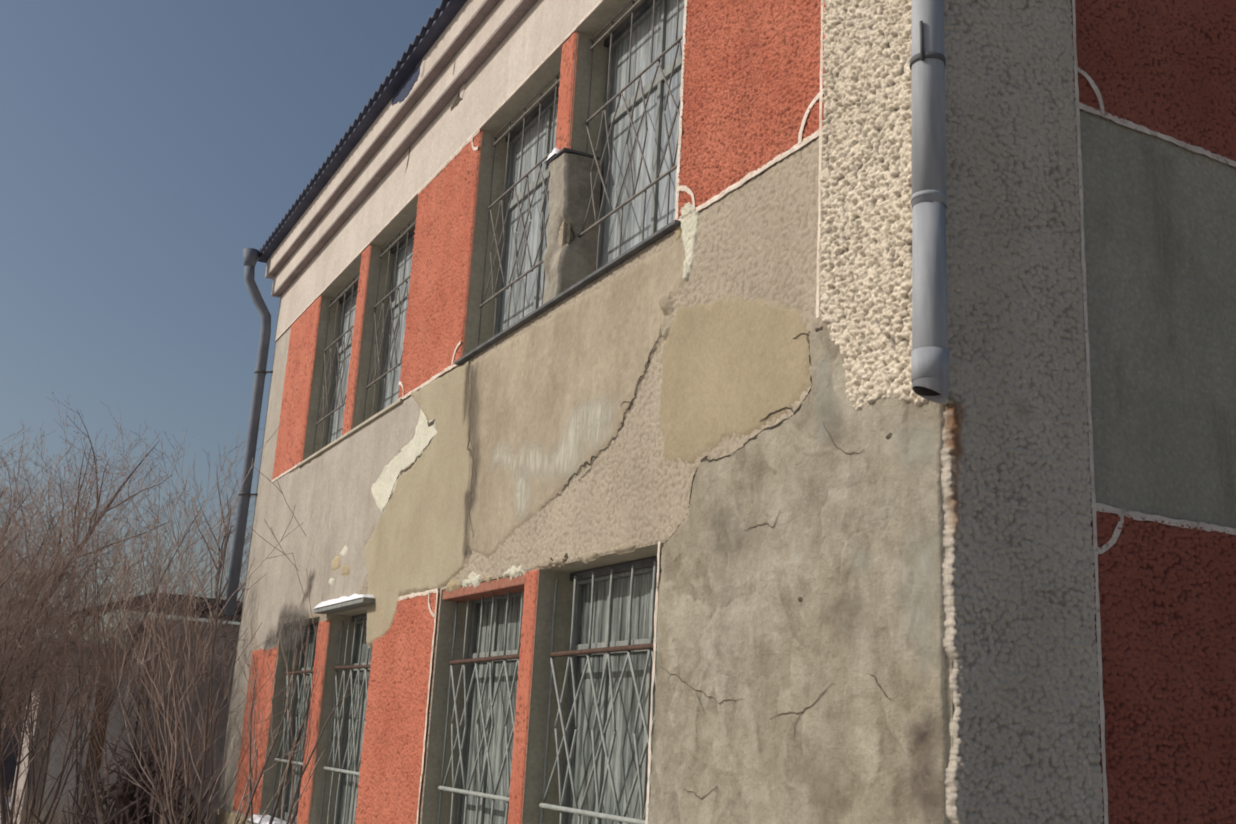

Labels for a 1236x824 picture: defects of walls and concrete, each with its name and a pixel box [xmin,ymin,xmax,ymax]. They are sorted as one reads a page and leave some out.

peeling [371,409,437,512]
water stain [464,366,477,555]
crack [467,359,477,531]
crack [540,292,670,511]
crack [663,332,864,546]
rust [946,405,963,505]
crack [659,666,743,712]
crack [771,683,833,741]